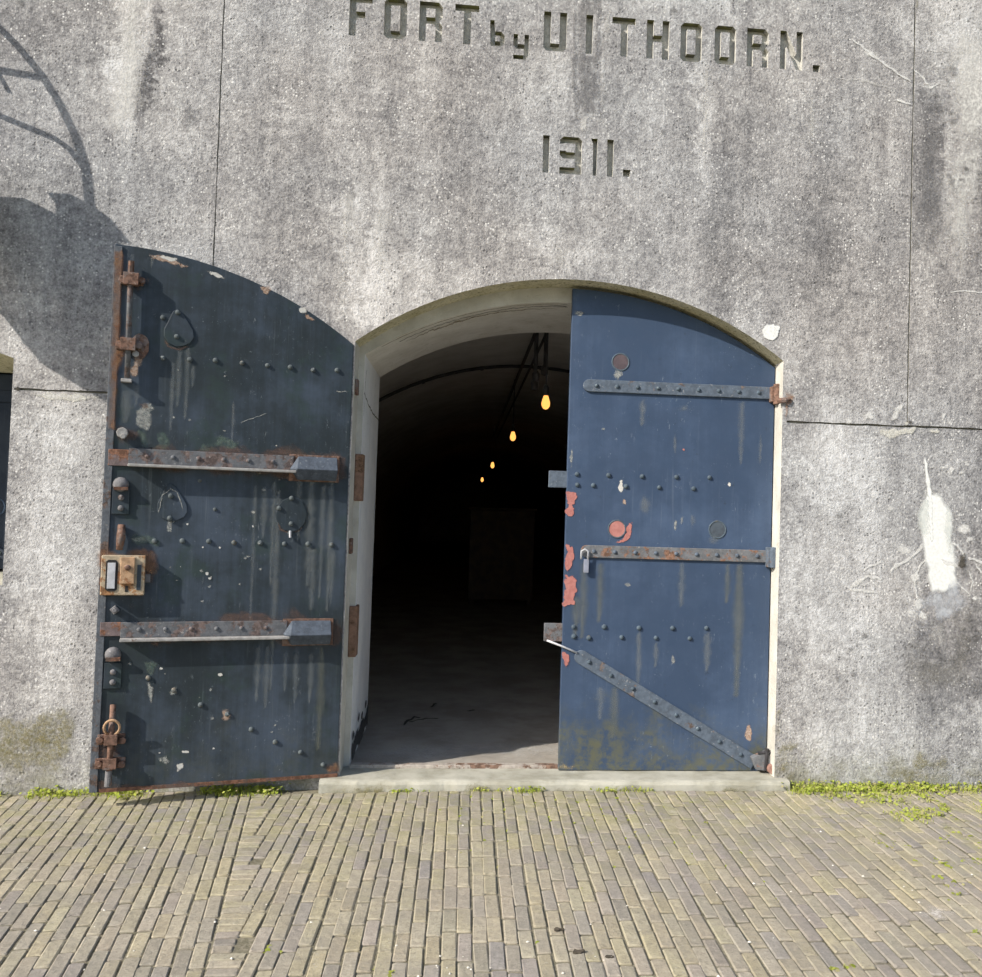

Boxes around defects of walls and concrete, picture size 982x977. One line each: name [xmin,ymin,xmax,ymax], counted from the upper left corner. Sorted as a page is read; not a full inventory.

leakage [946,32,982,138]
leakage [947,148,982,237]
leakage [850,459,973,619]